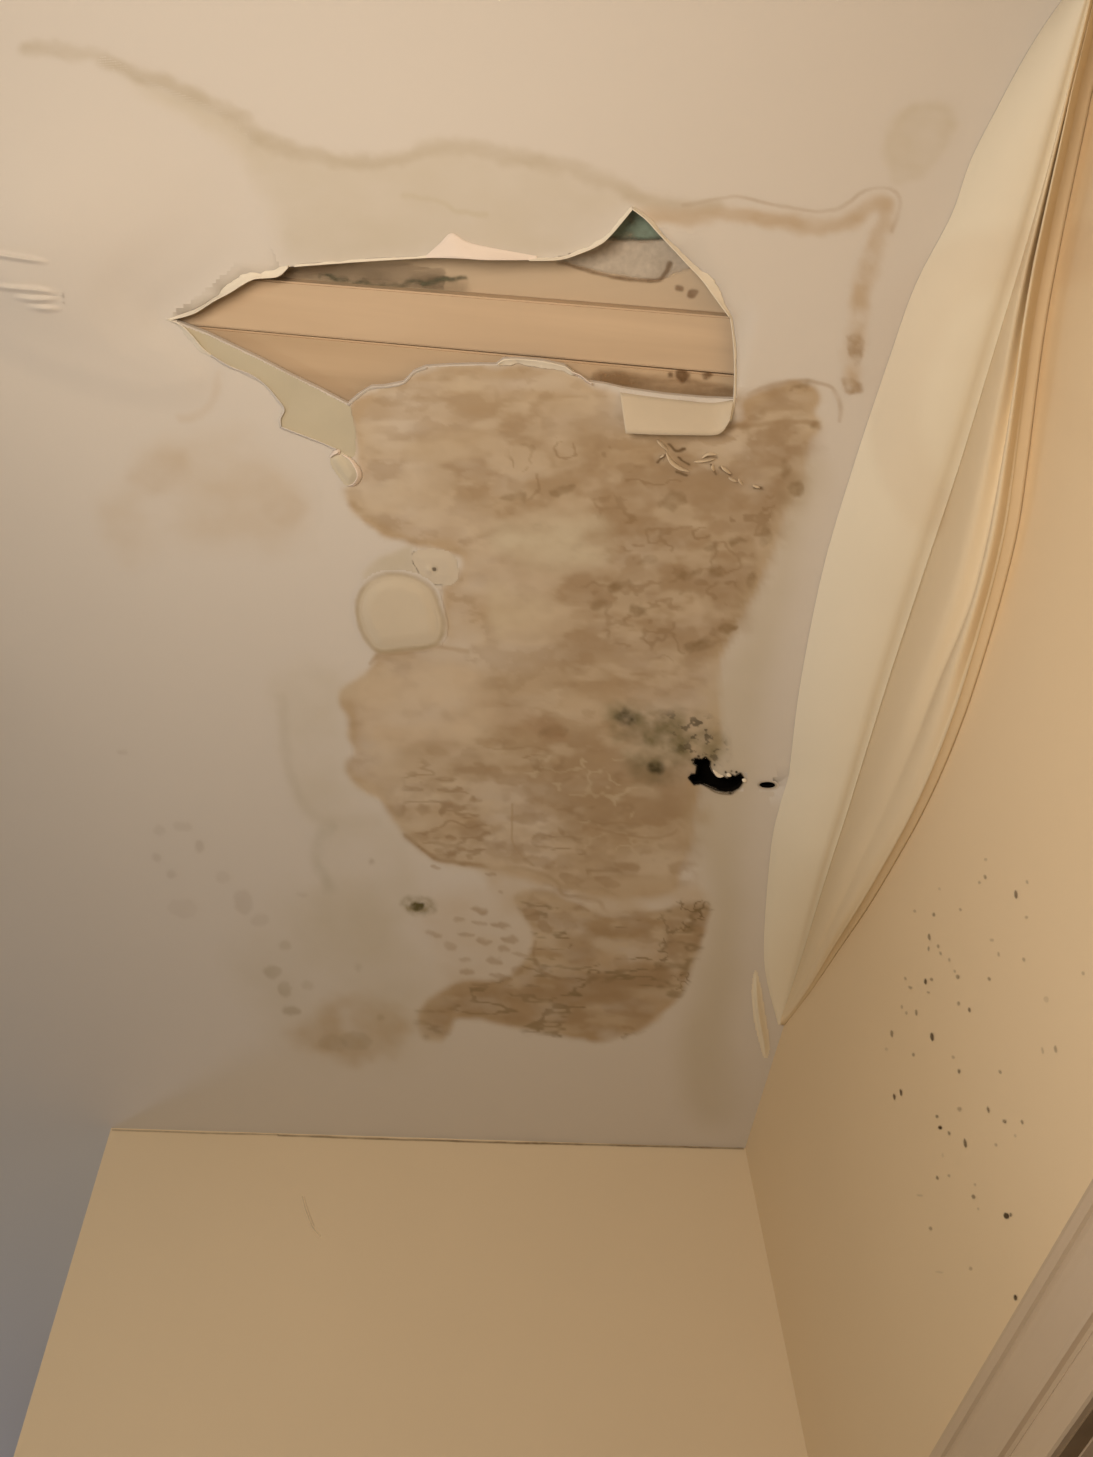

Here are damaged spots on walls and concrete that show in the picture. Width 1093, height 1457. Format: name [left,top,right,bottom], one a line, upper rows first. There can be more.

flaking render [183,326,362,487]
damp [13,35,965,1140]